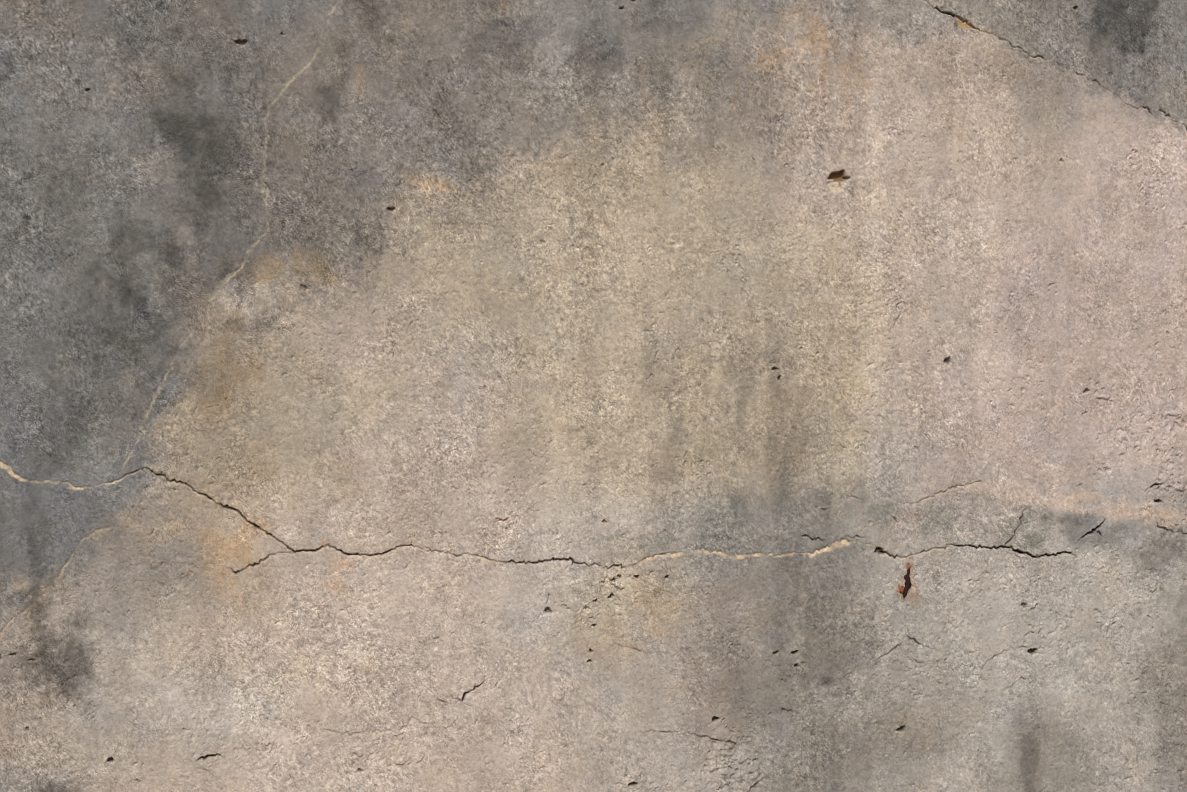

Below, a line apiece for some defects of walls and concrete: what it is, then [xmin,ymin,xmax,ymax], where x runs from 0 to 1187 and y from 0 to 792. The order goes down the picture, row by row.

crack [918,0,1187,132]
crack [0,0,1108,586]
corrosion [891,556,923,612]